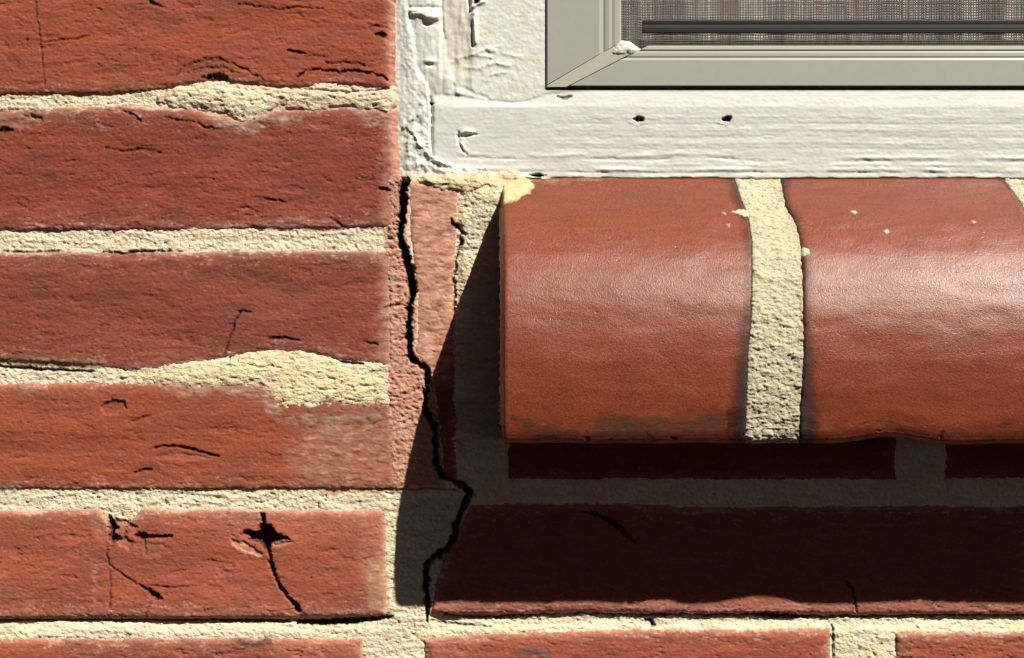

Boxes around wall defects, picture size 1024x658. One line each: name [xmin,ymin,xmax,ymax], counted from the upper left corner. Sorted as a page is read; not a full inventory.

crack [386,178,472,621]
crack [134,445,214,473]
crack [584,511,633,541]
crack [142,586,163,600]